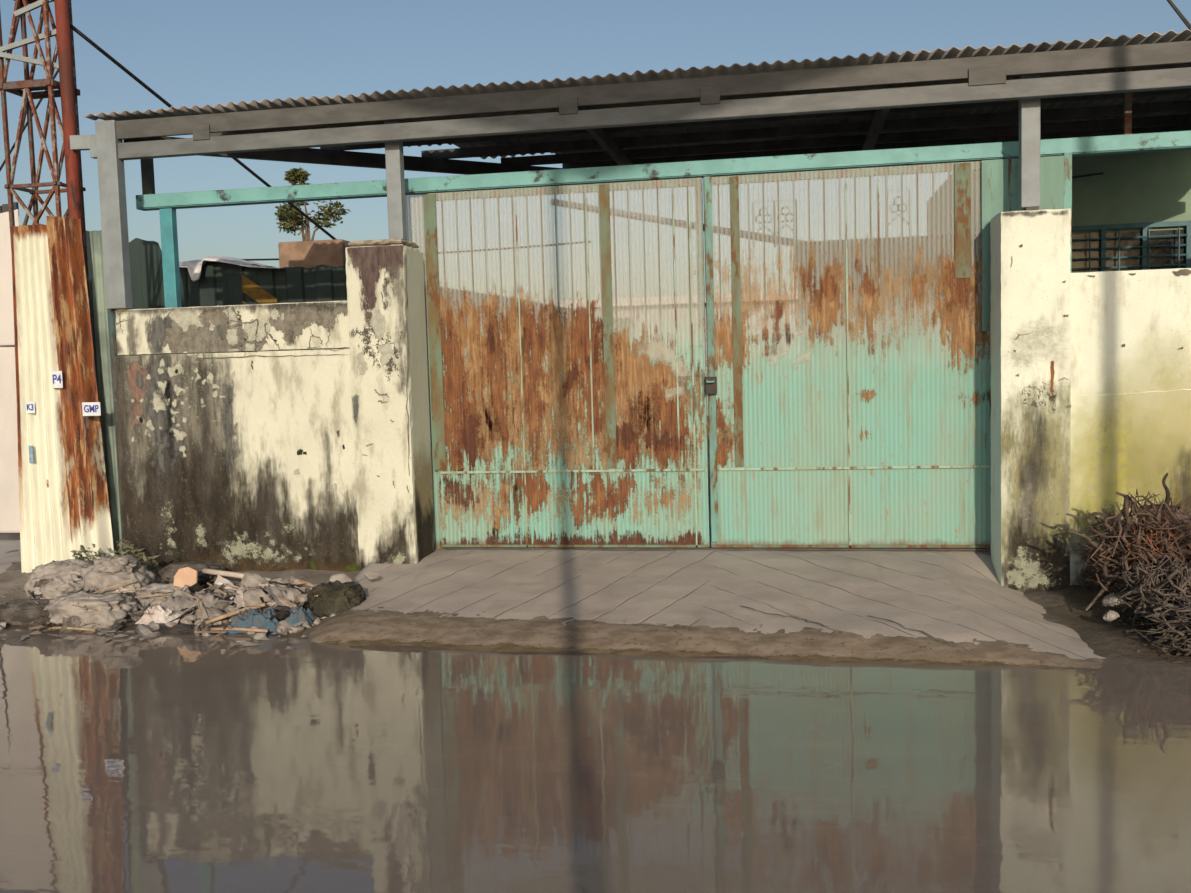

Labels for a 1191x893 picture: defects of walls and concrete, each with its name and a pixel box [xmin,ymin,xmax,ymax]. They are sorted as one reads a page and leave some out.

peeling [127,303,348,457]
damp [110,302,435,572]
peeling [351,306,405,385]
rust [439,239,991,546]
damp [1002,382,1146,592]